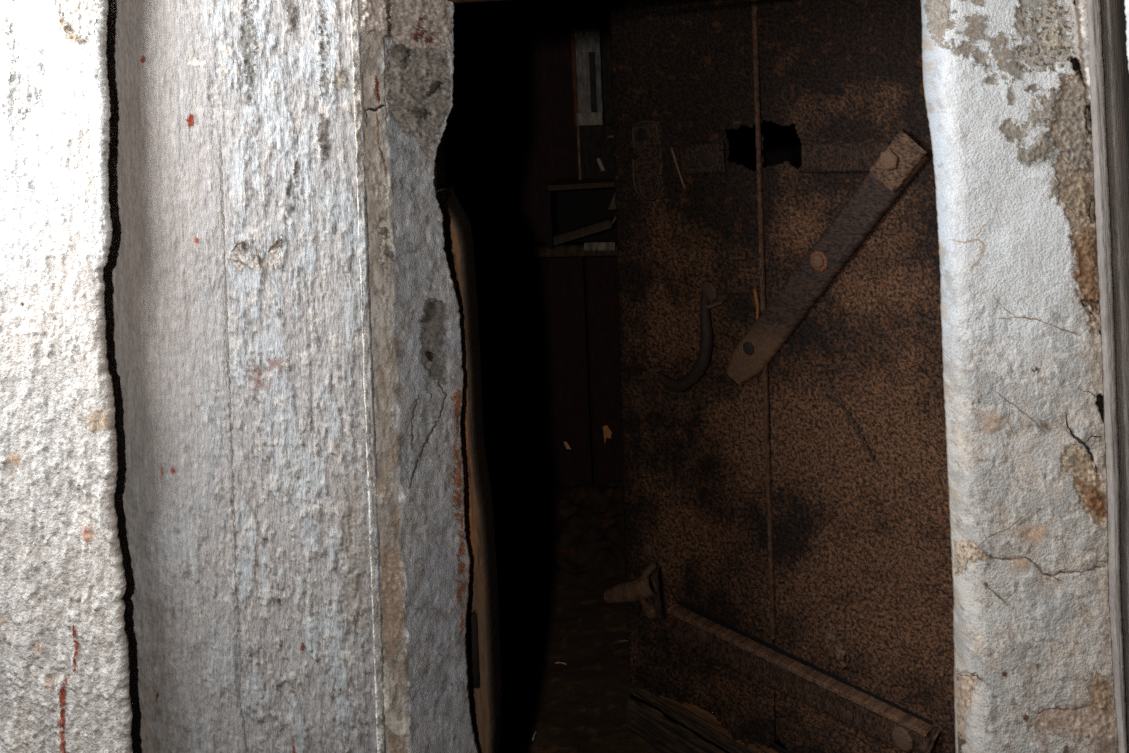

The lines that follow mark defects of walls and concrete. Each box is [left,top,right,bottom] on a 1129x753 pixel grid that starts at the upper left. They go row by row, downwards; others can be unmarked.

spalling [924,0,1101,338]
crack [994,390,1104,484]
crack [953,515,1107,603]
corrosion [45,625,79,753]